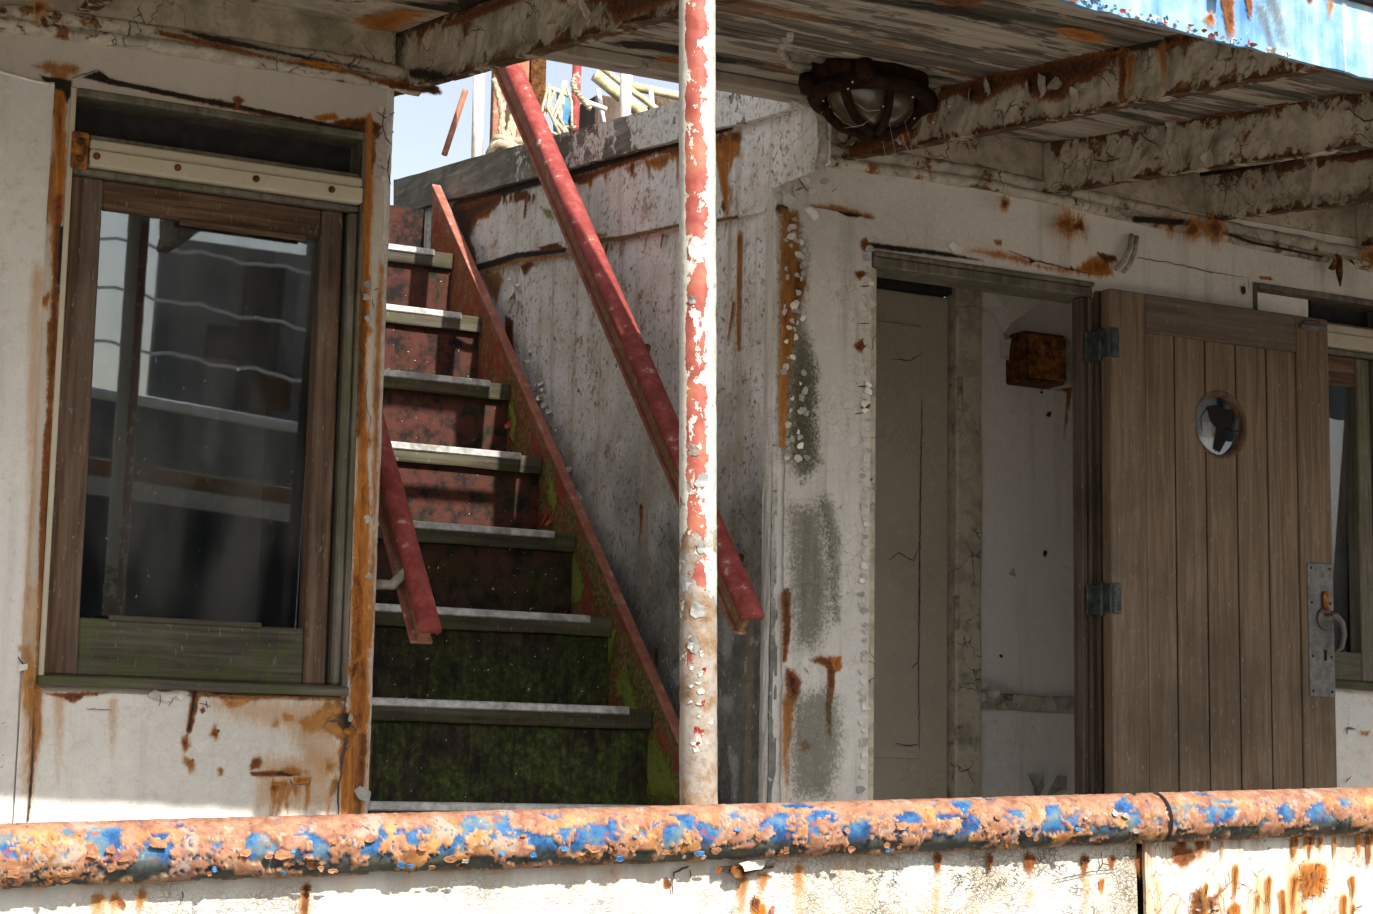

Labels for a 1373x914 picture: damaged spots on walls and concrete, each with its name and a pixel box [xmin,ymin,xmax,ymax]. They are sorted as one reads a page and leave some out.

peeling [1085,0,1291,58]
spalling [937,50,1111,106]
rust [569,142,679,188]
peeling [688,239,704,258]
rust [716,127,742,351]
rust [871,240,1117,278]
rust [19,61,109,822]
rust [102,78,384,815]
peeling [680,575,705,618]
rust [737,872,769,914]
rust [1172,841,1239,901]
rust [1257,833,1373,914]